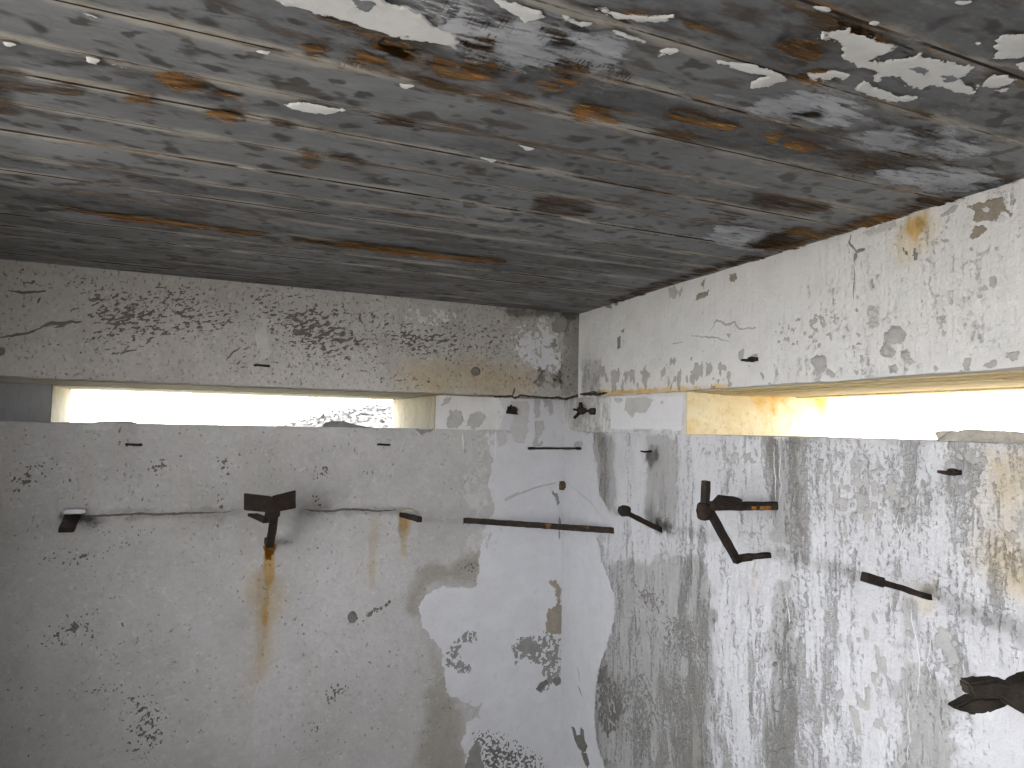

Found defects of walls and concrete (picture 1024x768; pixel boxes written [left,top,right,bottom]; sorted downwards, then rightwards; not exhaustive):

peeling [276,0,459,50]
peeling [494,0,546,23]
peeling [595,7,674,43]
peeling [713,60,787,89]
peeling [808,21,1024,102]
peeling [941,197,1013,252]
crack [0,290,82,338]
peeling [67,278,568,388]
crack [494,388,607,400]
corrosion [263,544,276,560]
spalling [511,579,562,693]
water stain [907,611,934,763]